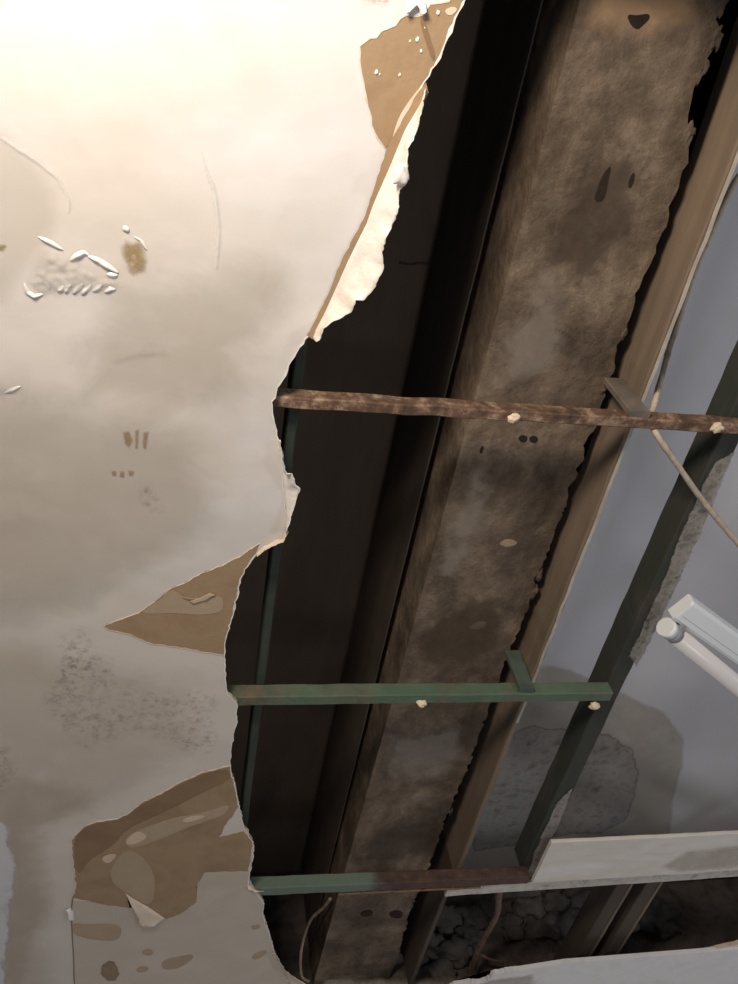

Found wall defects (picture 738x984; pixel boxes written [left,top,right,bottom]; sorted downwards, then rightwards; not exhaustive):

spalling [628,14,650,29]
spalling [696,0,729,86]
spalling [683,120,696,147]
peeling [307,83,428,342]
spalling [594,167,611,202]
peeling [66,871,289,984]